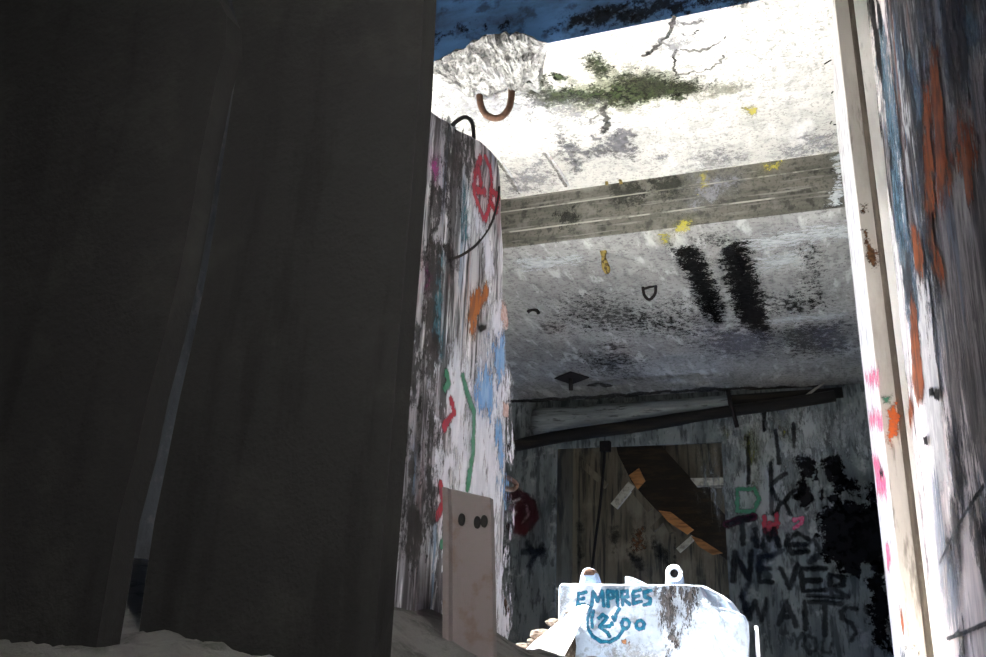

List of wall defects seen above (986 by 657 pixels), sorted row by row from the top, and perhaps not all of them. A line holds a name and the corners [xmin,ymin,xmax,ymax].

spalling [433,31,552,103]
crack [641,15,727,76]
water stain [609,148,746,210]
water stain [398,55,717,577]